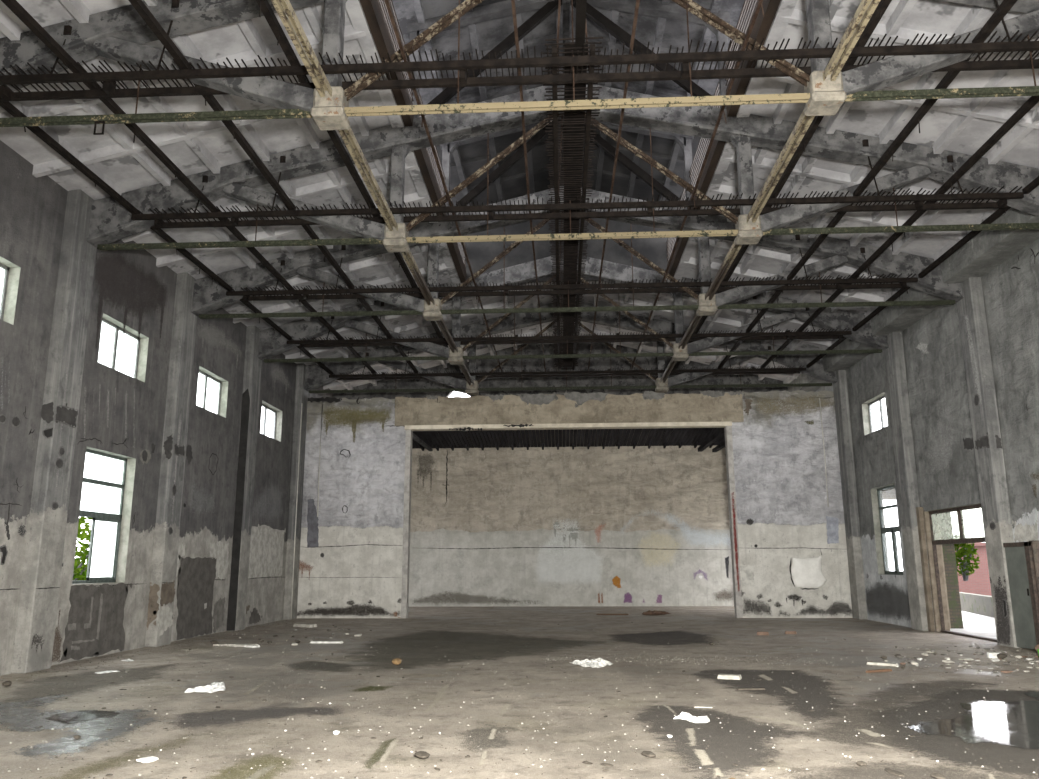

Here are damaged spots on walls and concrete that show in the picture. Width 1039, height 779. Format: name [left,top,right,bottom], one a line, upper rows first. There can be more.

spalling [41,402,78,470]
flaking render [60,583,132,662]
flaking render [146,527,229,640]